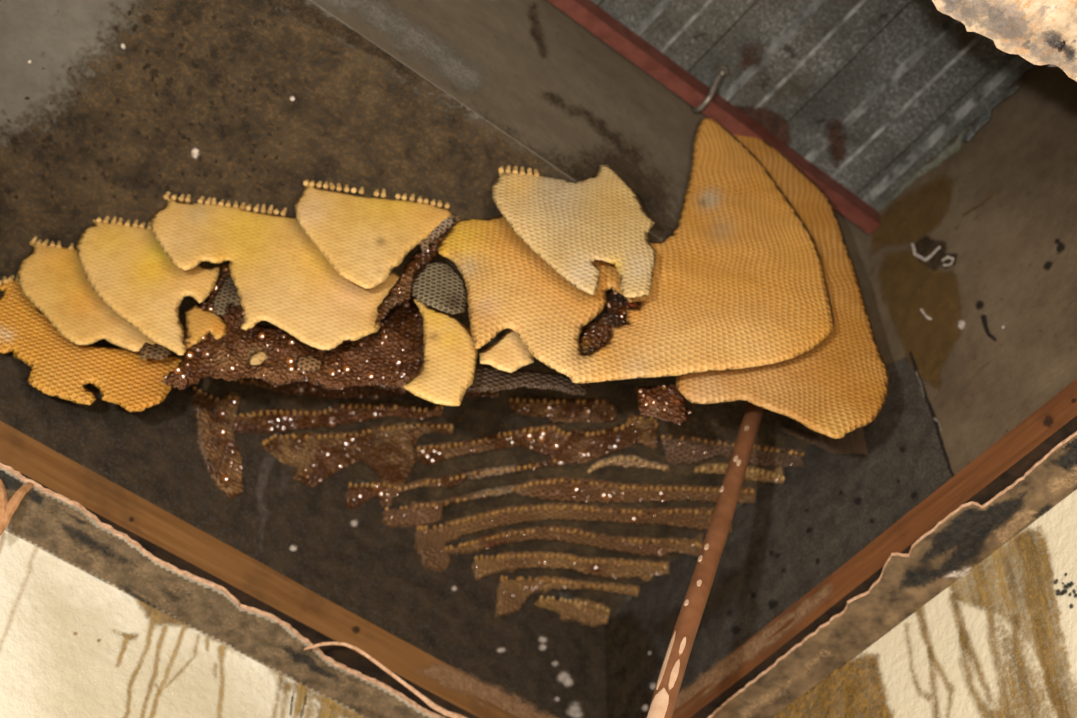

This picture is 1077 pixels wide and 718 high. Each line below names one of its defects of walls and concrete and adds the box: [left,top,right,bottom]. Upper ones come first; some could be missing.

water stain [0,0,673,297]
spalling [1044,239,1065,270]
water stain [89,339,122,348]
water stain [179,295,208,331]
water stain [440,302,471,331]
water stain [476,328,510,367]
water stain [679,176,961,693]
water stain [0,351,748,718]
water stain [899,438,1077,718]
water stain [741,649,831,718]
water stain [773,655,893,718]